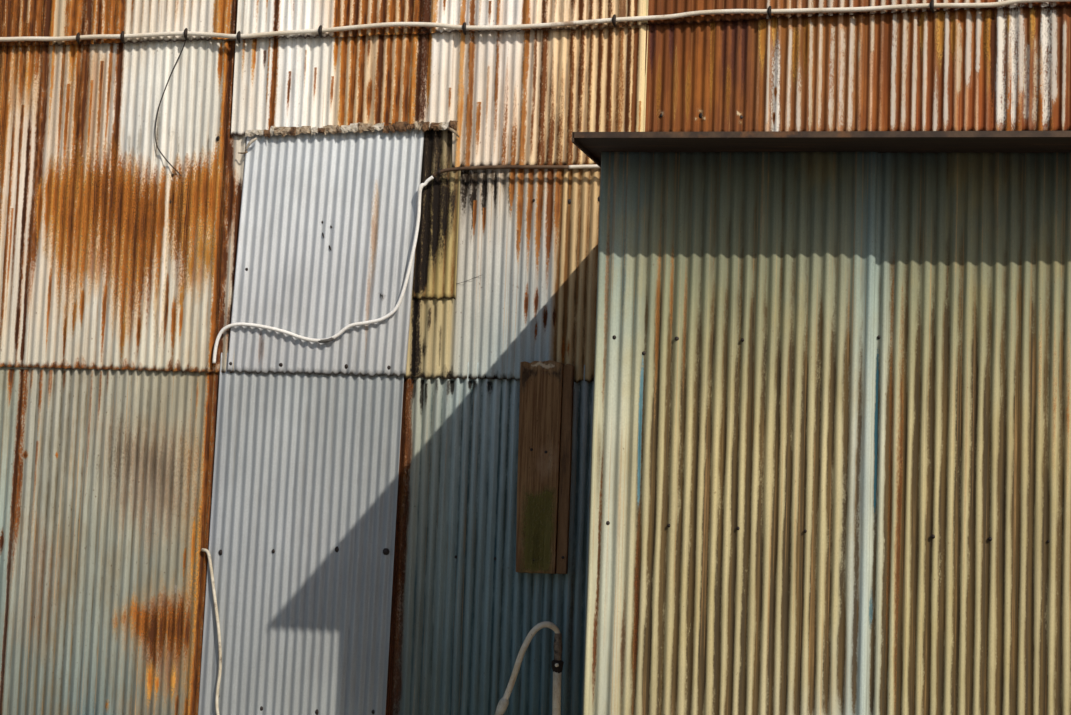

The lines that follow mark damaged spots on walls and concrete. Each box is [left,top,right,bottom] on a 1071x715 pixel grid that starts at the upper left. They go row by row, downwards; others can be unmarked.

rust [330,0,446,126]
rust [449,0,481,167]
rust [473,200,486,234]
rust [488,0,674,276]
rust [792,21,809,82]
rust [920,10,956,66]
rust [983,9,1021,131]
rust [1038,65,1052,131]
rust [0,0,291,715]
rust [385,377,412,715]
rust [589,457,603,695]
rust [621,512,640,681]